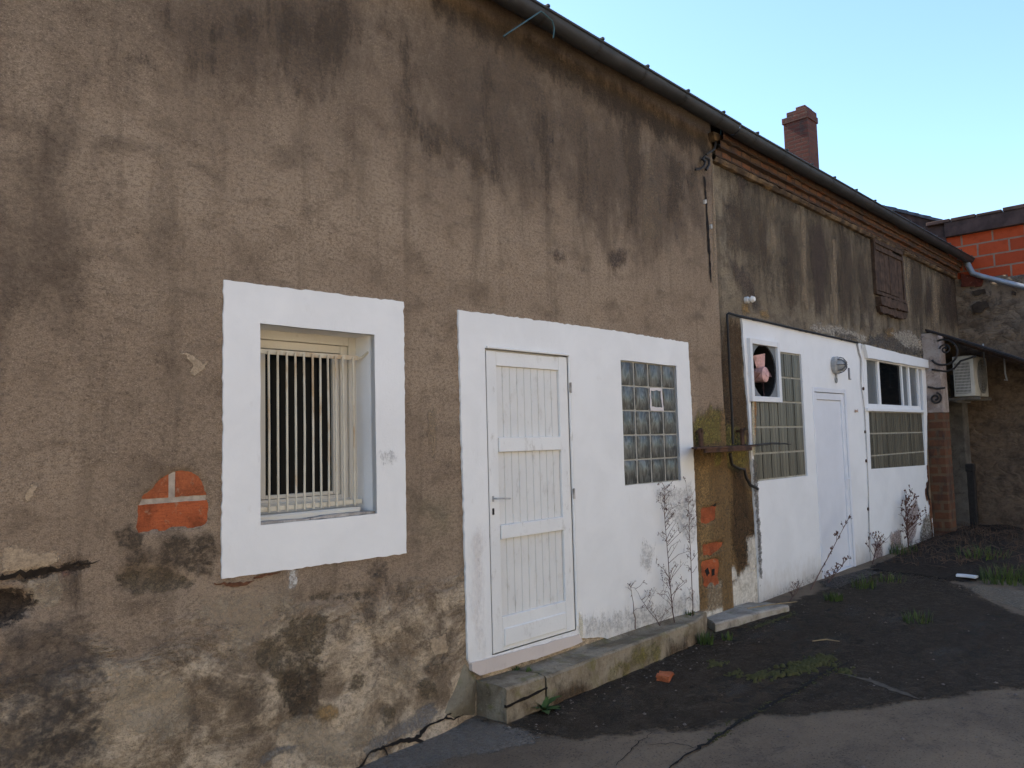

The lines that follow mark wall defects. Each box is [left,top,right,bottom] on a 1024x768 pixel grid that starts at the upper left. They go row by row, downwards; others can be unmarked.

leakage [433,0,708,240]
leakage [723,178,896,337]
leakage [693,266,769,613]
crack [0,545,100,604]
spalling [115,471,217,595]
spalling [701,542,722,587]
leakage [348,675,364,690]
crack [356,713,464,768]